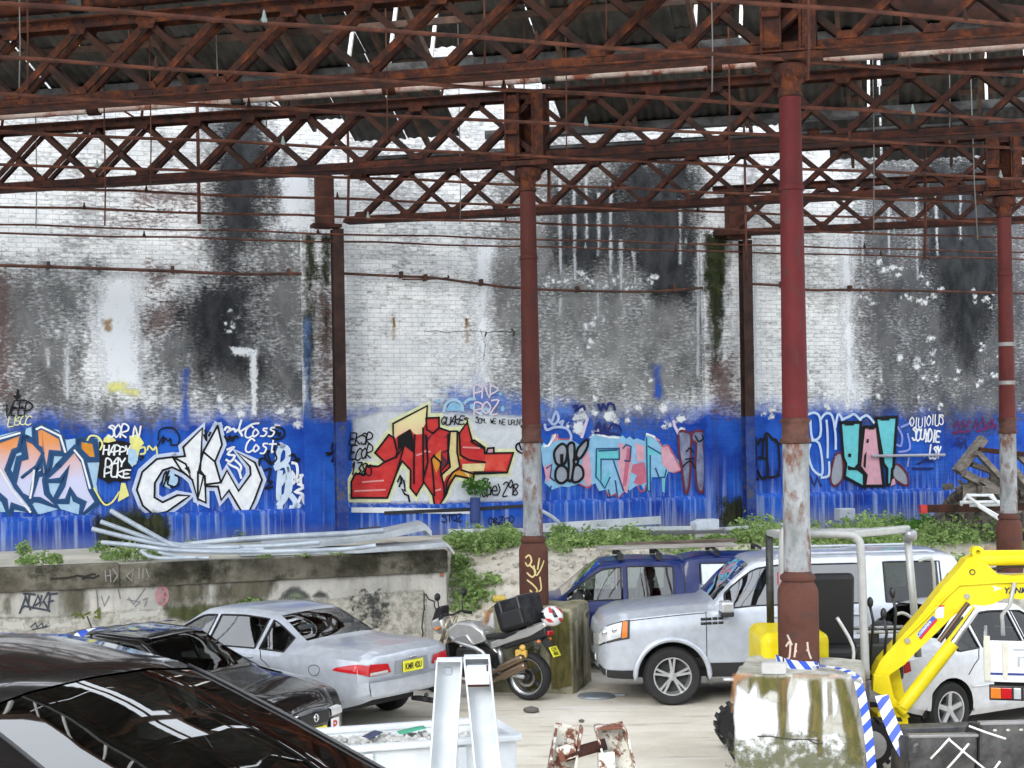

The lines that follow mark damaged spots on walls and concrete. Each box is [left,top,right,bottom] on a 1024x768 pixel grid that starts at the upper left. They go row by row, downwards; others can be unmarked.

leakage [0,107,304,433]
leakage [463,173,522,402]
leakage [536,157,710,433]
leakage [841,154,999,439]
leakage [1011,197,1024,419]
leakage [780,678,789,710]
leakage [848,678,865,767]